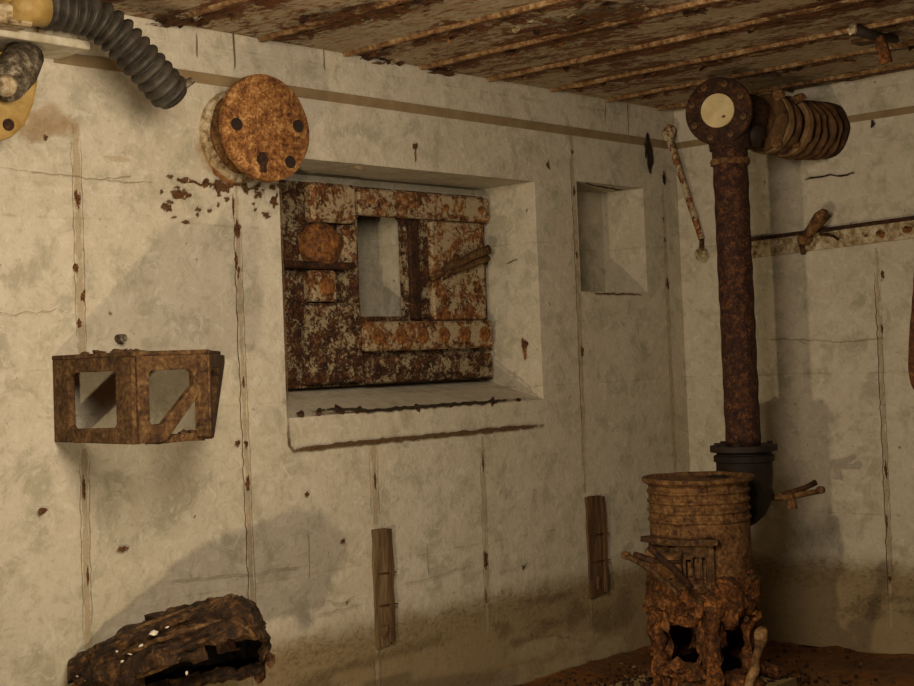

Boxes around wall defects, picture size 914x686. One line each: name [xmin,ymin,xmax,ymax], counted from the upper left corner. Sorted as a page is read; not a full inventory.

crack [805,172,854,180]